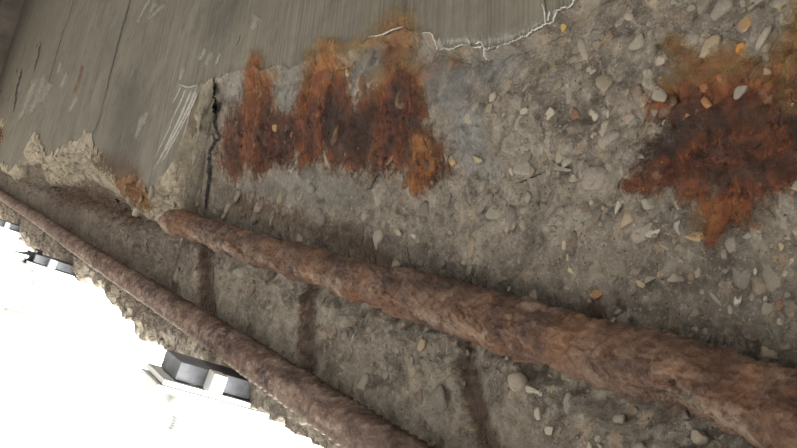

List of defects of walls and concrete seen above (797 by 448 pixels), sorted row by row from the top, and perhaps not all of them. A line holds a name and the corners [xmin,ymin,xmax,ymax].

crack [204,78,224,210]
spalling [254,53,320,144]
rust [213,9,451,198]
spalling [323,35,387,119]
spalling [683,83,718,139]
rust [618,10,797,251]
spalling [733,85,748,100]
spalling [0,200,342,448]
rust [200,245,214,312]
rust [300,283,316,373]
rust [461,340,496,448]